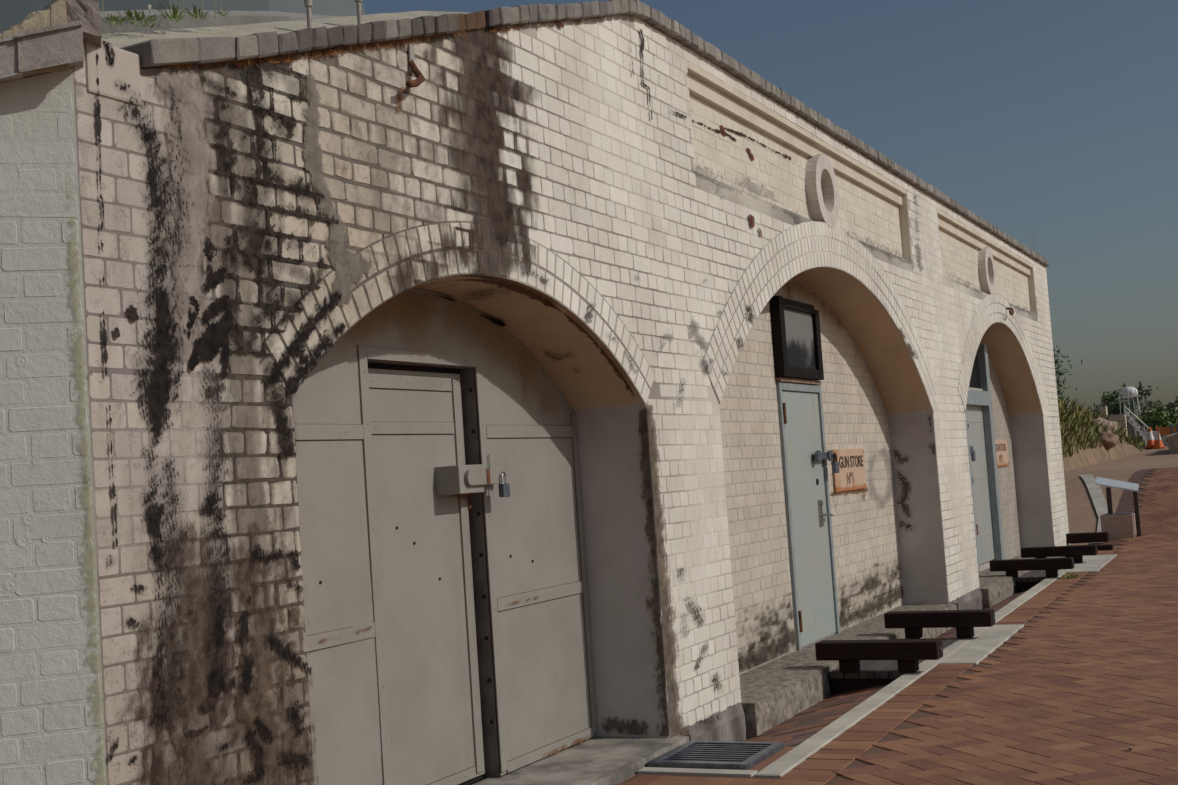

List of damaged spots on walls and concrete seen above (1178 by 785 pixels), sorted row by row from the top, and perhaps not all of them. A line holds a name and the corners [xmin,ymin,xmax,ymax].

water stain [103,40,114,66]
water stain [200,58,345,460]
water stain [392,27,548,295]
crack [629,28,791,160]
water stain [116,83,318,785]
water stain [603,404,719,738]
water stain [738,600,797,672]
water stain [839,562,904,629]